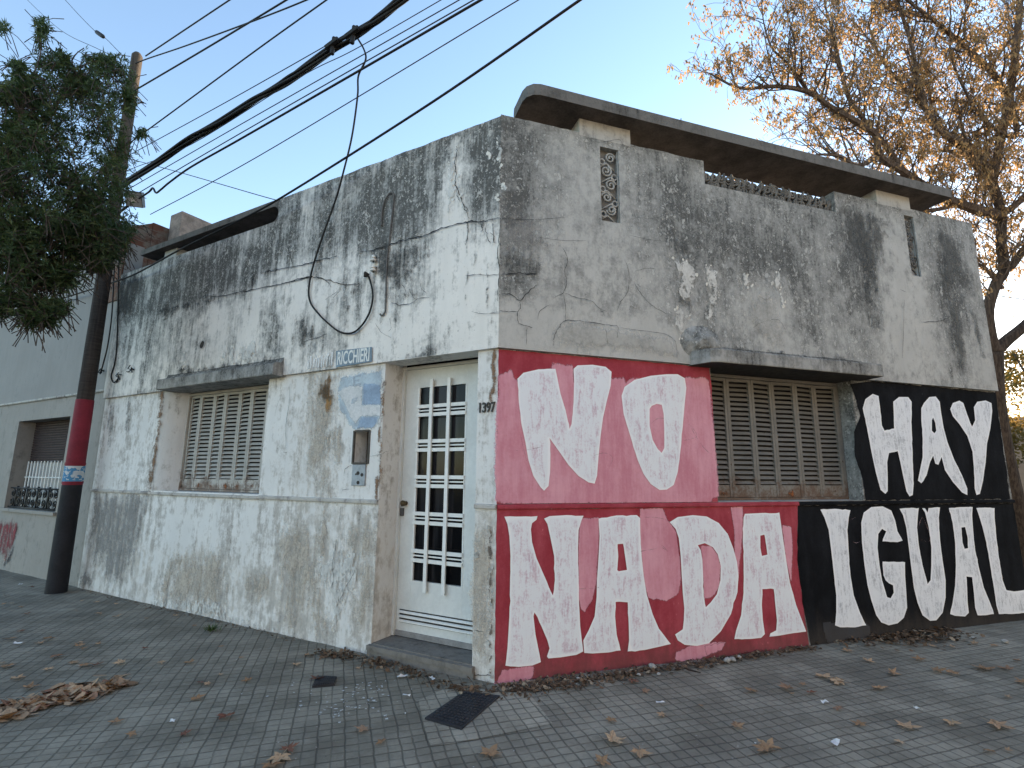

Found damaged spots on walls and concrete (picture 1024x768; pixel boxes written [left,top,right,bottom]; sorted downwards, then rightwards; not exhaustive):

damp [292,319,313,346]
damp [378,243,428,296]
crack [202,146,677,348]
peeling [672,256,720,340]
damp [844,211,885,325]
damp [938,233,970,371]
corrosion [319,376,332,412]
damp [91,489,145,581]